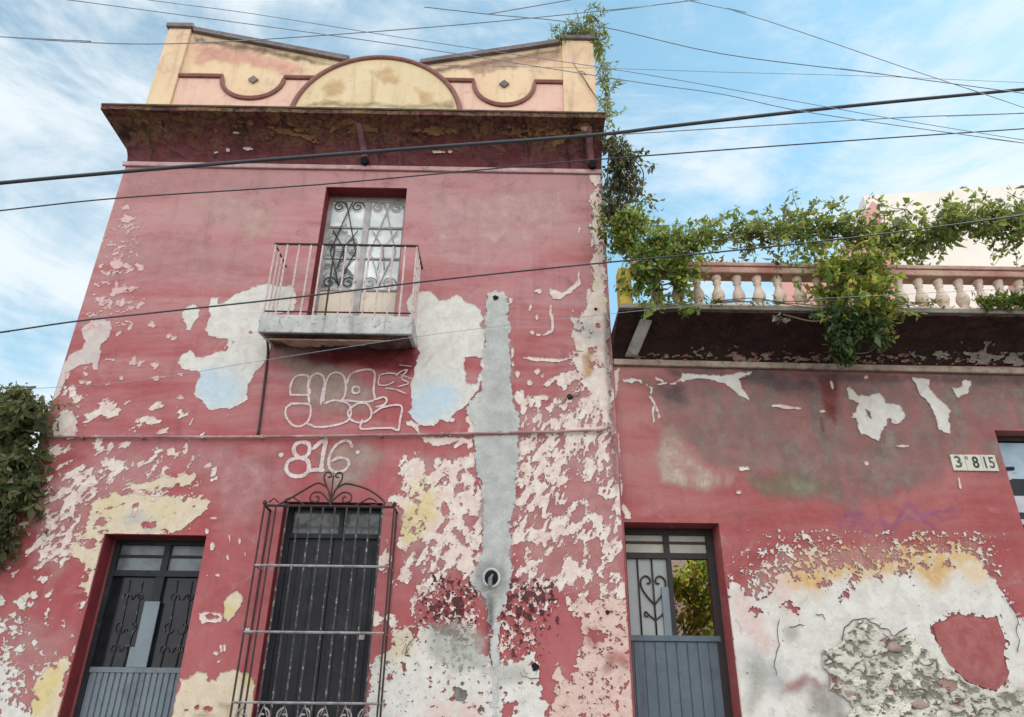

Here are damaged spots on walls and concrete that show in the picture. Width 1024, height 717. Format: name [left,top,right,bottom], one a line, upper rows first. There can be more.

peeling [0,200,389,717]
peeling [367,175,840,717]
peeling [847,386,905,441]
peeling [854,341,1024,434]
leakage [418,572,559,680]
peeling [724,529,1024,717]